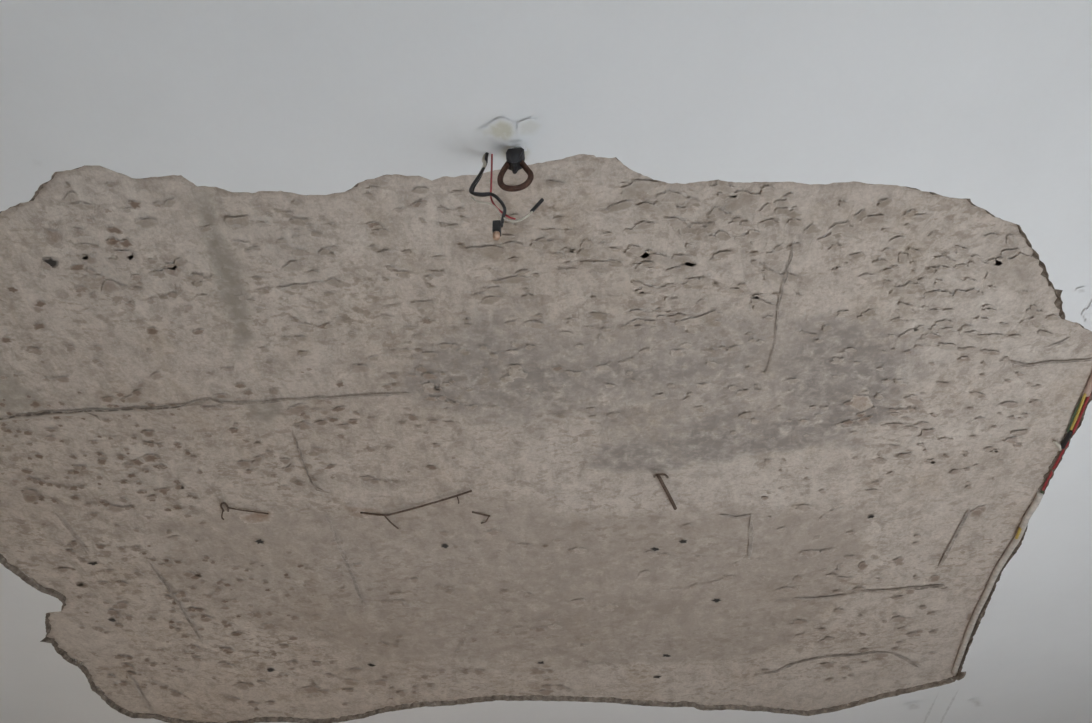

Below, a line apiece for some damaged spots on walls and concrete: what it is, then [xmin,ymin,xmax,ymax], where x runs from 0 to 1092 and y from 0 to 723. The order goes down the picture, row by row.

crack [0,393,413,422]
flaking render [0,154,1092,723]